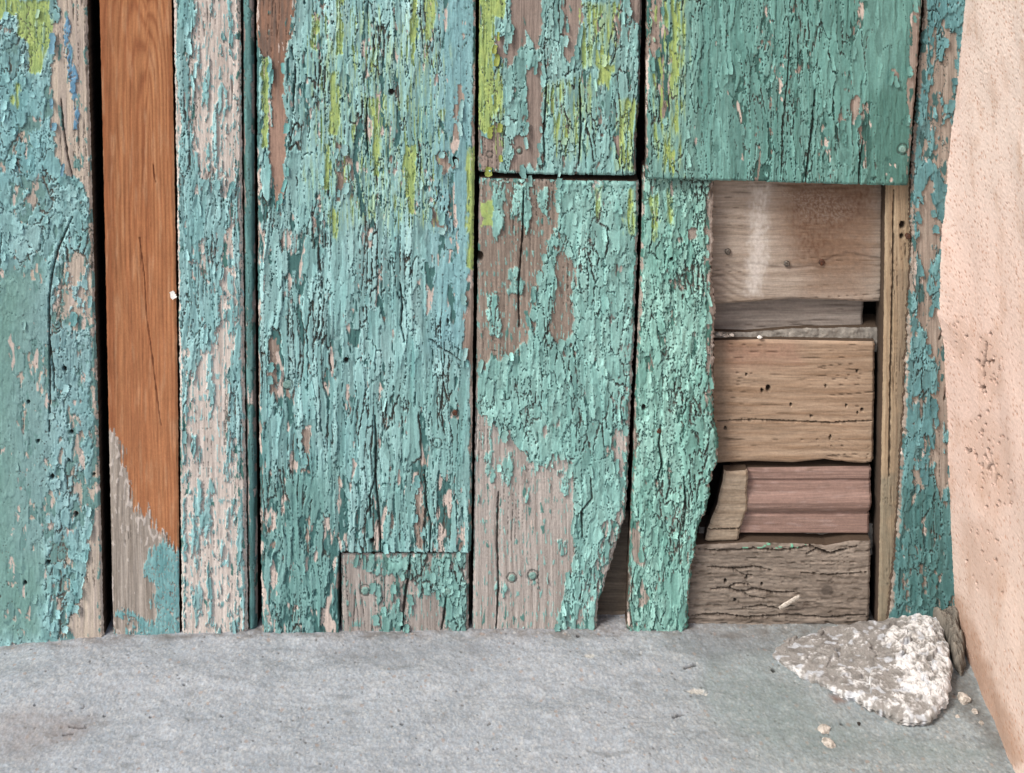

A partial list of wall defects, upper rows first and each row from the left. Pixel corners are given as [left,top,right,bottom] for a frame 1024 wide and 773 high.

peeling [49,0,93,202]
peeling [184,0,240,216]
peeling [256,0,297,242]
peeling [319,140,354,202]
crack [517,188,525,328]
peeling [461,0,613,373]
peeling [862,0,921,157]
peeling [32,256,242,639]
peeling [342,408,589,634]
peeling [609,398,629,474]
crack [655,424,867,620]
flaking render [913,302,1017,599]